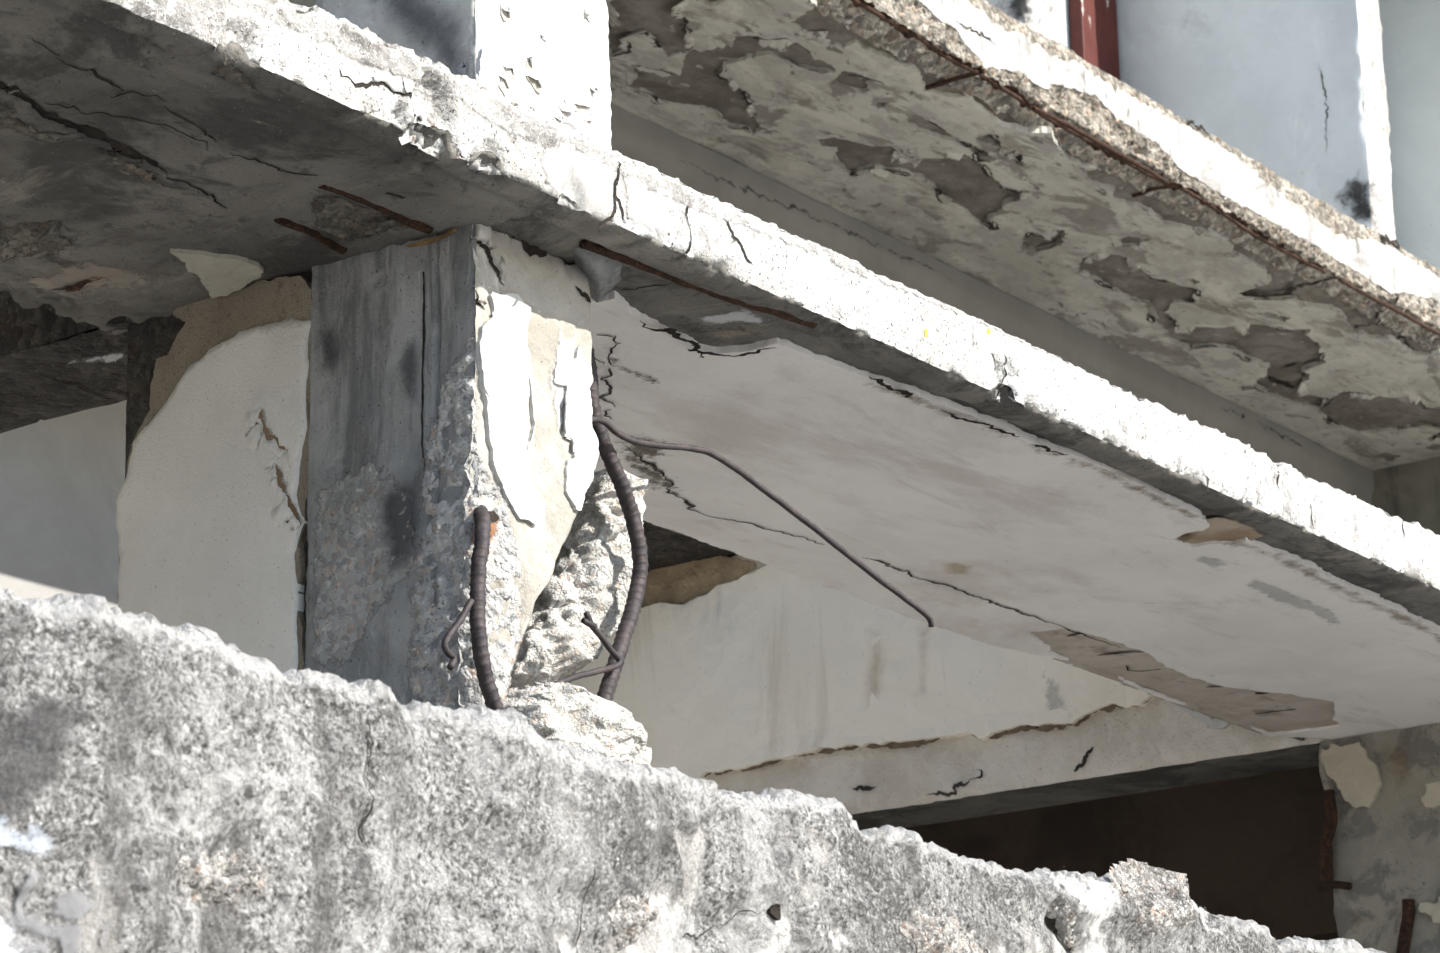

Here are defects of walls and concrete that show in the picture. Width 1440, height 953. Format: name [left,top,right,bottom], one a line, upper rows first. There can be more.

crack [0,38,318,210]
crack [339,65,423,145]
peeling [540,140,673,235]
spalling [971,53,1380,298]
leakage [73,354,123,362]
peeling [551,333,599,511]
crack [869,376,1068,455]
spalling [310,291,543,711]
rust [473,511,499,541]
spalling [641,556,756,608]
spalling [1031,629,1338,734]
crack [703,700,1149,797]